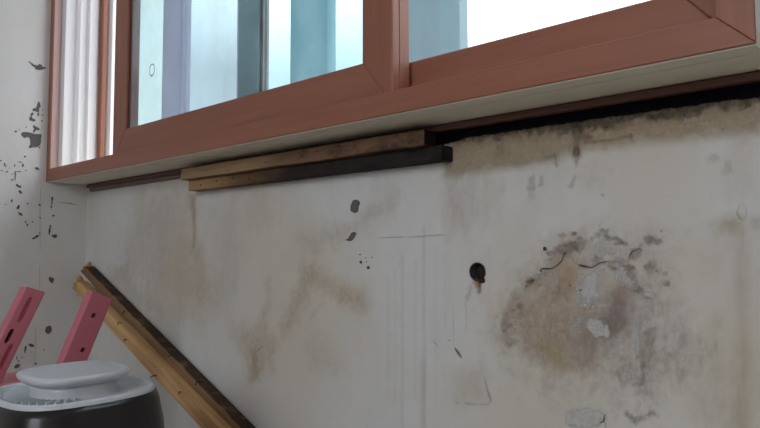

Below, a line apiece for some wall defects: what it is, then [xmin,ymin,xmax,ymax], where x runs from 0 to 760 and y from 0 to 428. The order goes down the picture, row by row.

peeling [15,102,43,148]
leakage [436,82,760,171]
crack [540,252,608,270]
peeling [573,318,610,338]